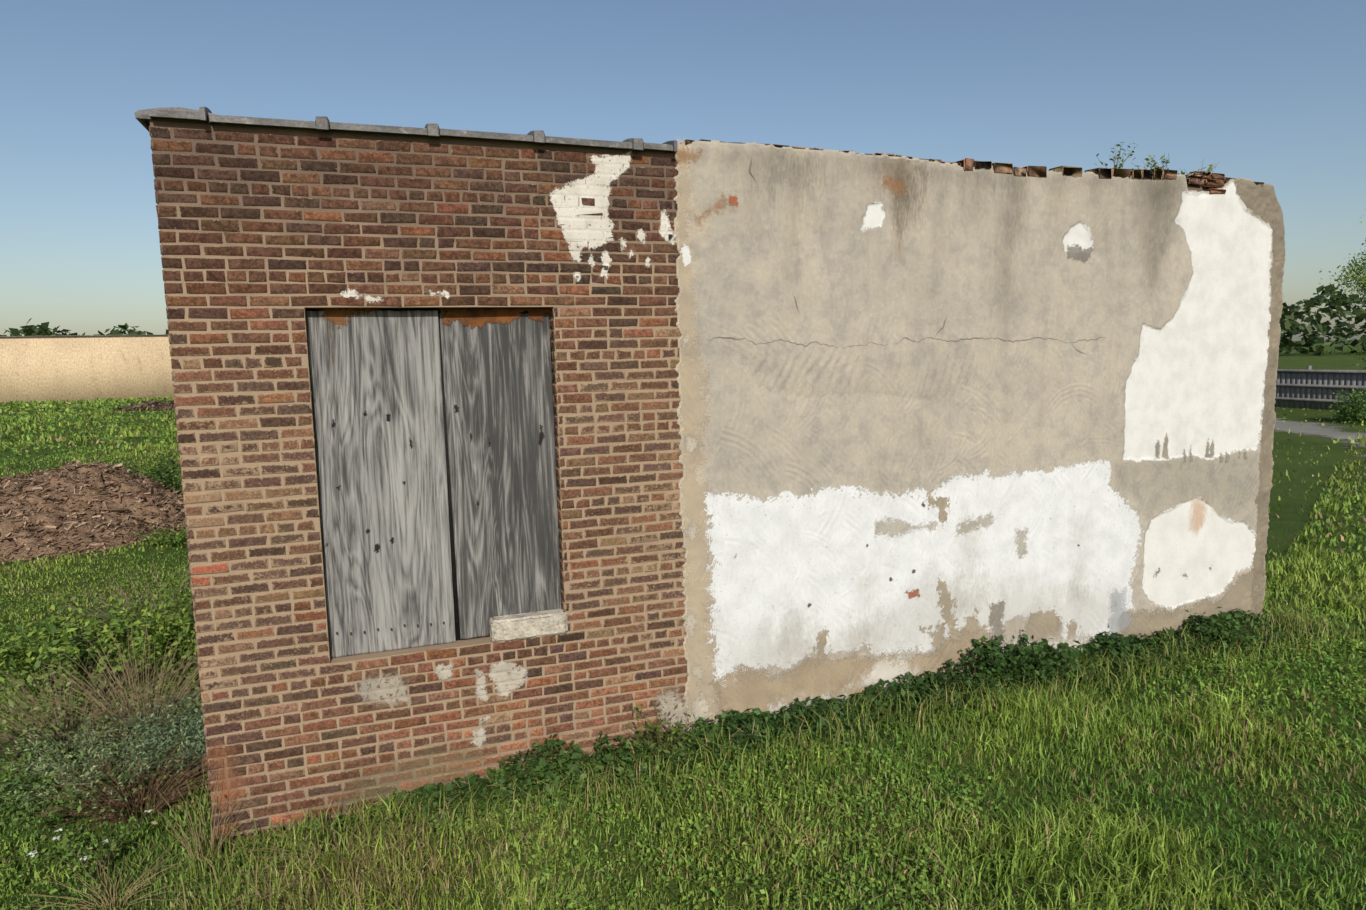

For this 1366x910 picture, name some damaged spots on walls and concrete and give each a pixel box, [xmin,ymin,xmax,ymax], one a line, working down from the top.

peeling [550,150,692,282]
crack [708,292,1105,354]
peeling [683,171,1285,734]